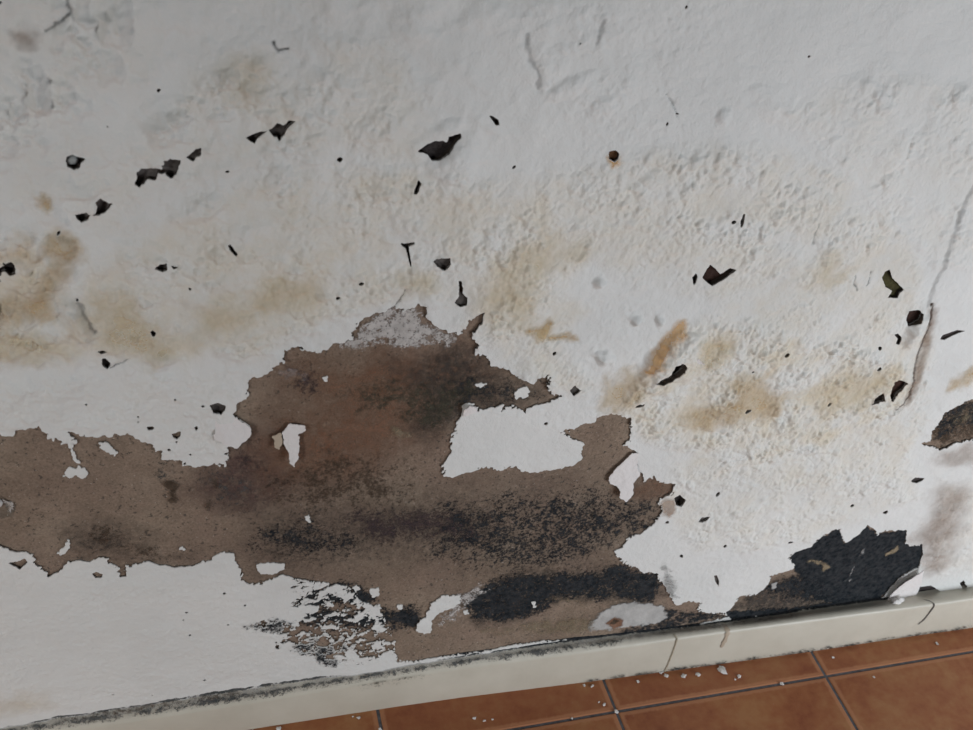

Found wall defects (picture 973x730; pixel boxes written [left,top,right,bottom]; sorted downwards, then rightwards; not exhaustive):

peeling [922,399,973,449]
peeling [0,304,936,662]
water stain [244,617,293,635]